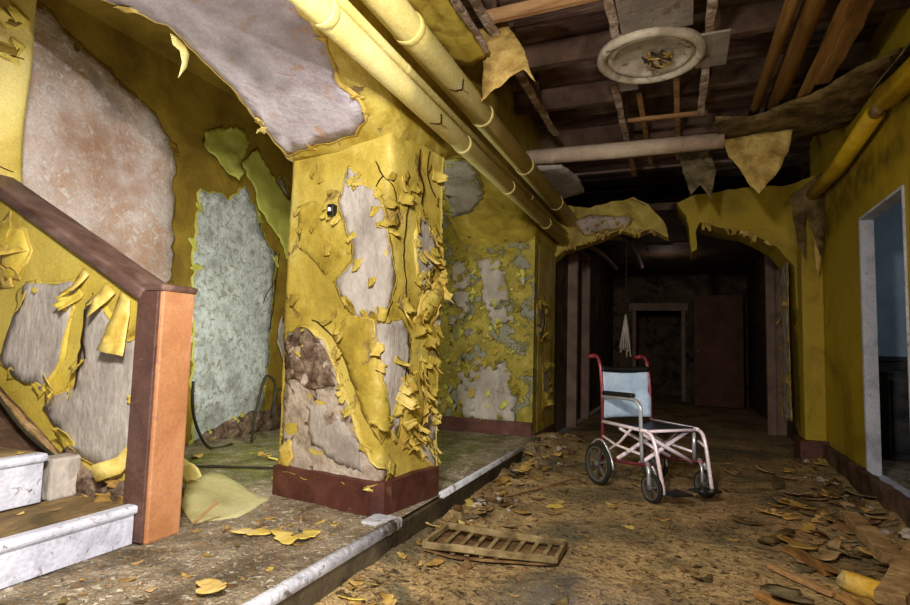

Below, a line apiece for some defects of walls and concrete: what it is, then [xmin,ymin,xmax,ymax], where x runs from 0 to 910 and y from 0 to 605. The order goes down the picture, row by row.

flaking render [0,0,179,285]
crack [375,149,442,298]
flaking render [564,212,655,251]
flaking render [0,208,142,503]
peeling [541,359,555,411]